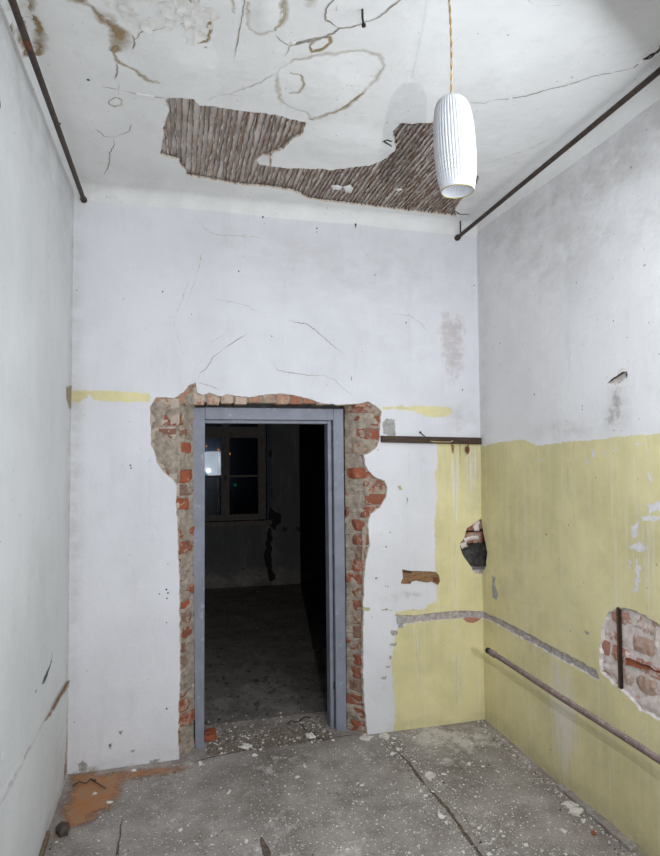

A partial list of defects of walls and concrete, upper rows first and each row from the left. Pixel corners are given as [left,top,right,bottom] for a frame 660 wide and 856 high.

water stain [10,3,43,56]
water stain [93,9,153,82]
crack [206,0,401,102]
crack [483,46,660,104]
spalling [160,98,468,217]
crack [197,333,247,389]
spalling [150,382,396,759]
spalling [460,519,498,599]
peeling [628,501,660,593]
peeling [381,608,404,680]
spalling [599,608,660,721]
corrosion [62,753,180,827]